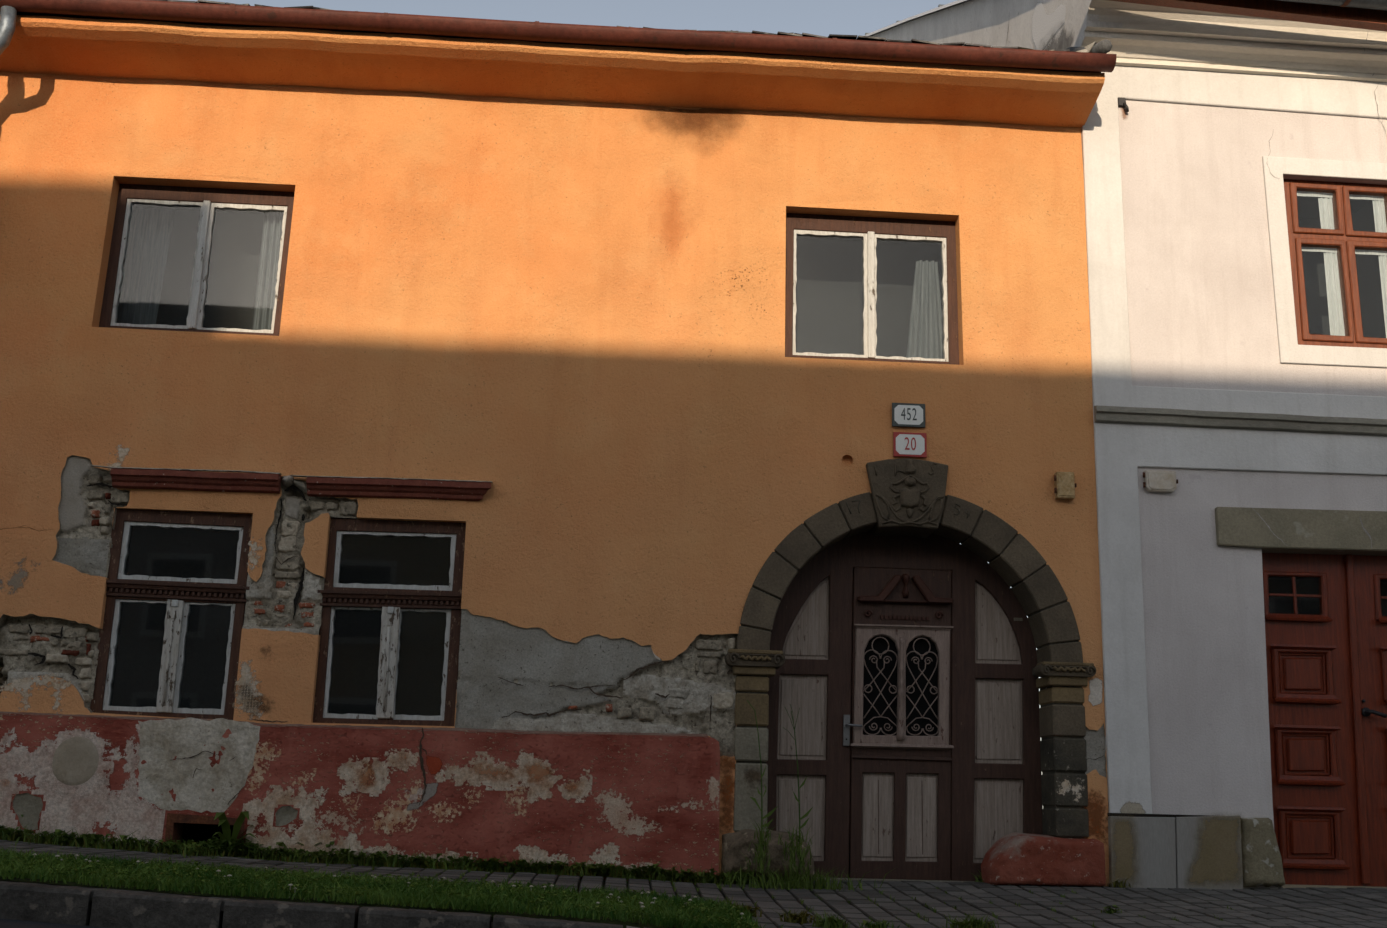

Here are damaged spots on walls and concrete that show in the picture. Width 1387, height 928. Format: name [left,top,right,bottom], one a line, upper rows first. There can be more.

damp [672,108,730,129]
flaking render [0,445,493,635]
peeling [0,616,166,848]
flaking render [455,609,737,757]
peeling [242,739,720,875]